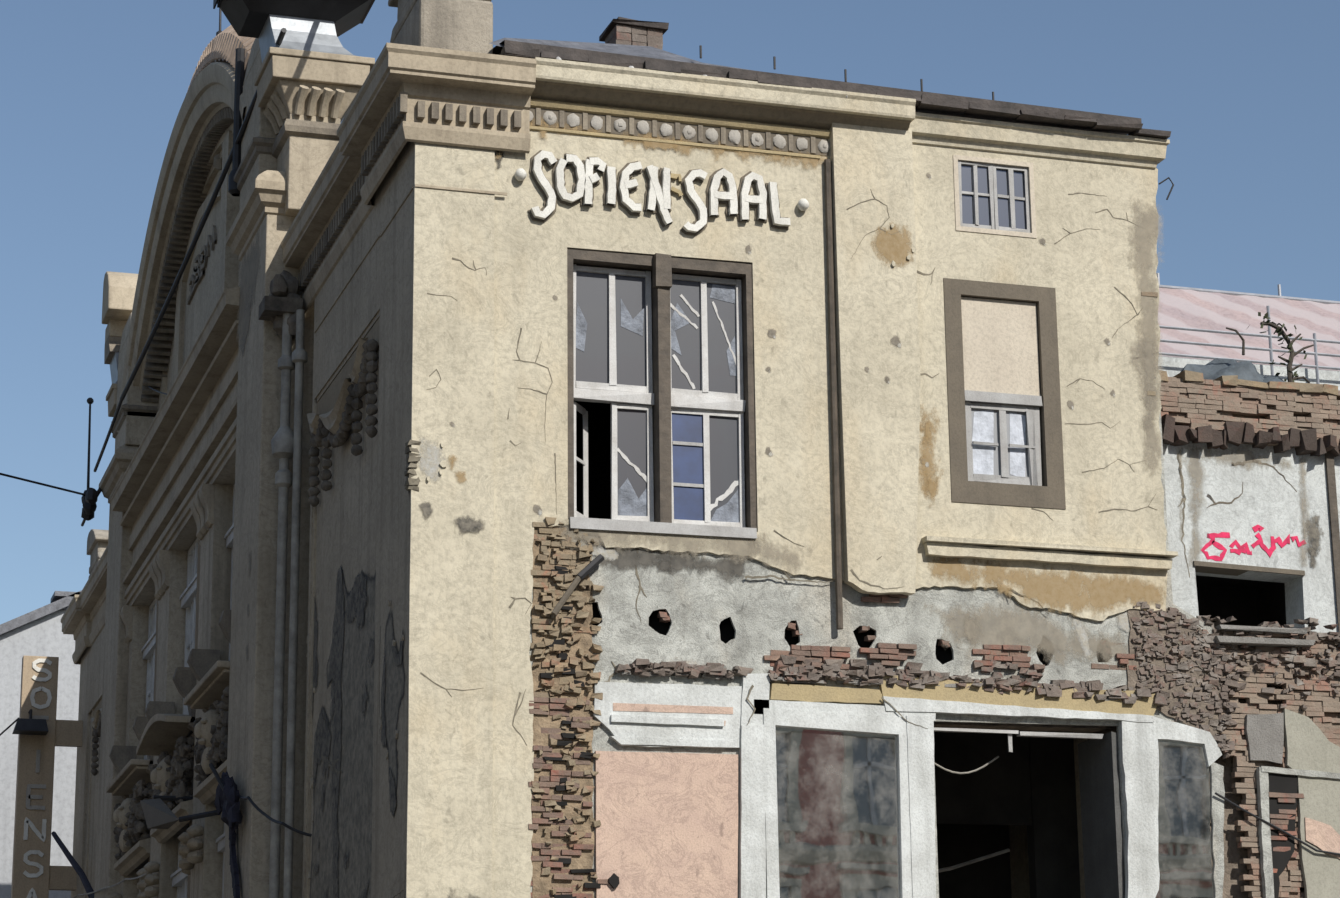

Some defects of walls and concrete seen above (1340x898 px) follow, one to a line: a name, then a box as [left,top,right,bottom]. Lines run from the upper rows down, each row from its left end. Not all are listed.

crack [847,191,900,257]
leakage [1131,207,1162,469]
leakage [1179,449,1323,568]
flaking render [306,567,405,898]
spalling [528,505,1340,898]